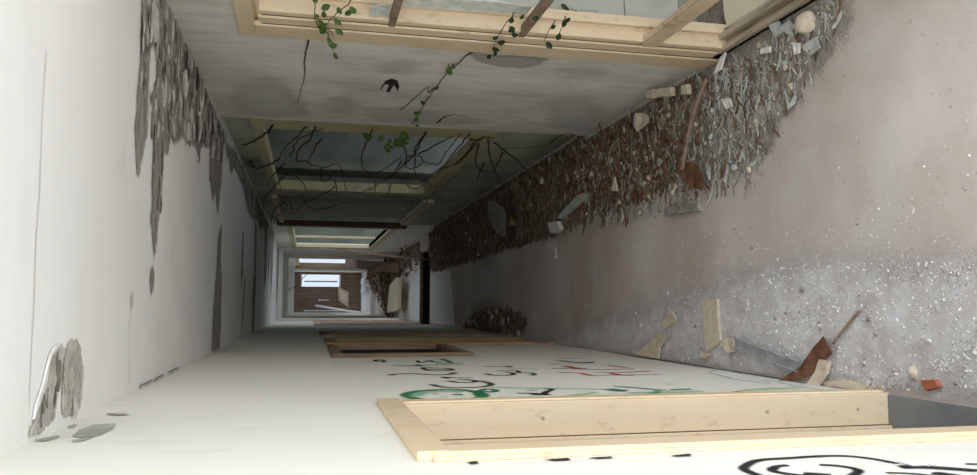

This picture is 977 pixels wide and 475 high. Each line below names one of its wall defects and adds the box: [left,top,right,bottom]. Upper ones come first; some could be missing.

peeling [134,0,269,255]
peeling [29,339,128,442]